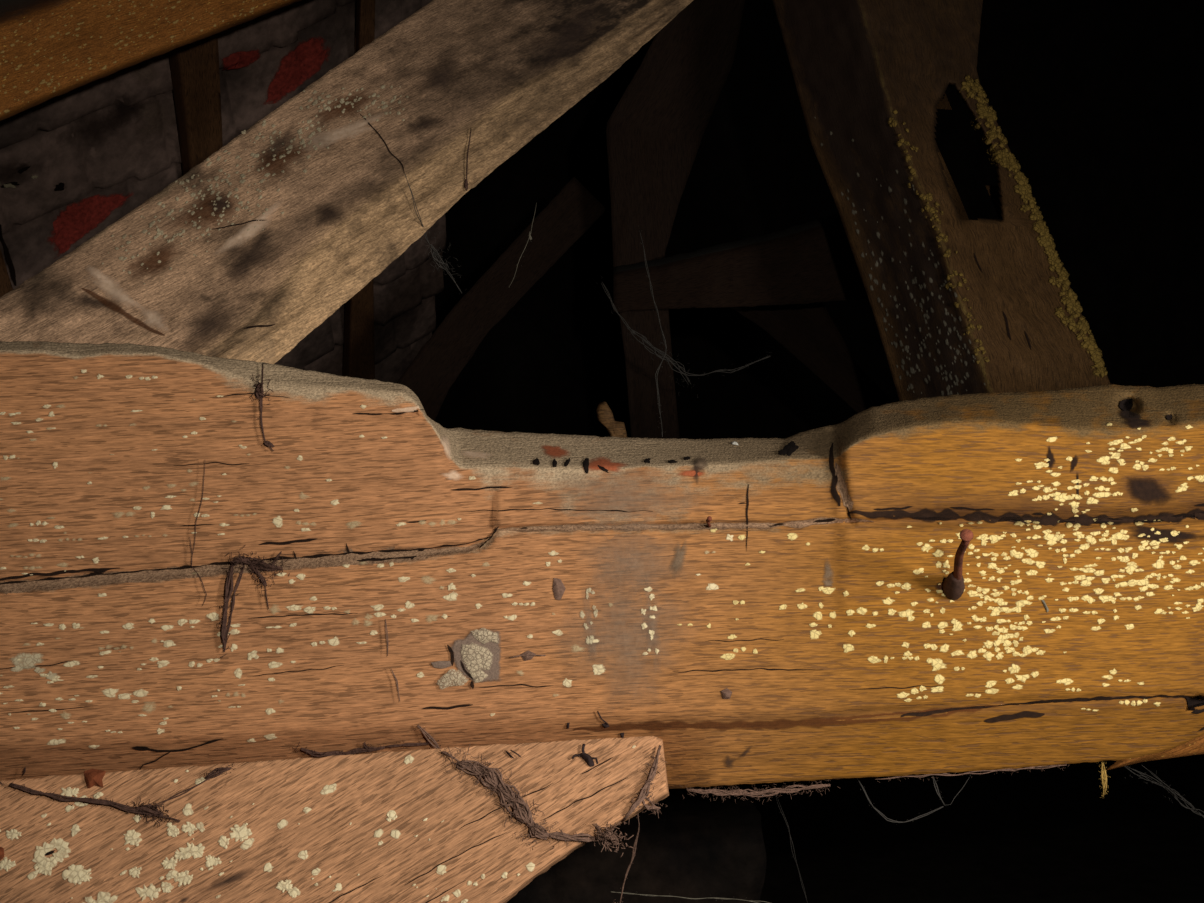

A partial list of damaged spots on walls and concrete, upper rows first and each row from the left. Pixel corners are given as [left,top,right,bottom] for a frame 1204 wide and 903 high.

damp [102,85,432,284]
crack [211,391,289,399]
crack [0,443,1204,594]
crack [253,611,353,619]
crack [673,638,813,673]
crack [0,661,87,670]
crack [255,665,344,676]
crack [11,706,85,714]
crack [329,684,1204,903]